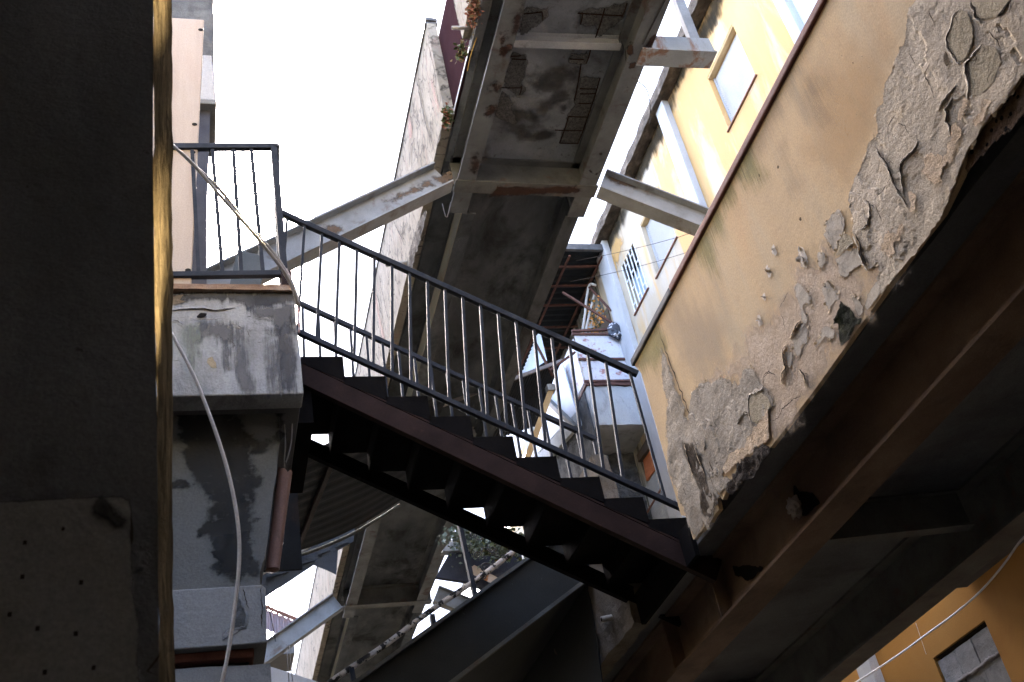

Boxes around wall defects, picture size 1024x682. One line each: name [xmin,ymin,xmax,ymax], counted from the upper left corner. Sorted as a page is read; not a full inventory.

rust [499,14,521,57]
rust [489,185,580,197]
peeling [661,0,1024,538]
water stain [174,292,297,395]
water stain [172,413,285,580]